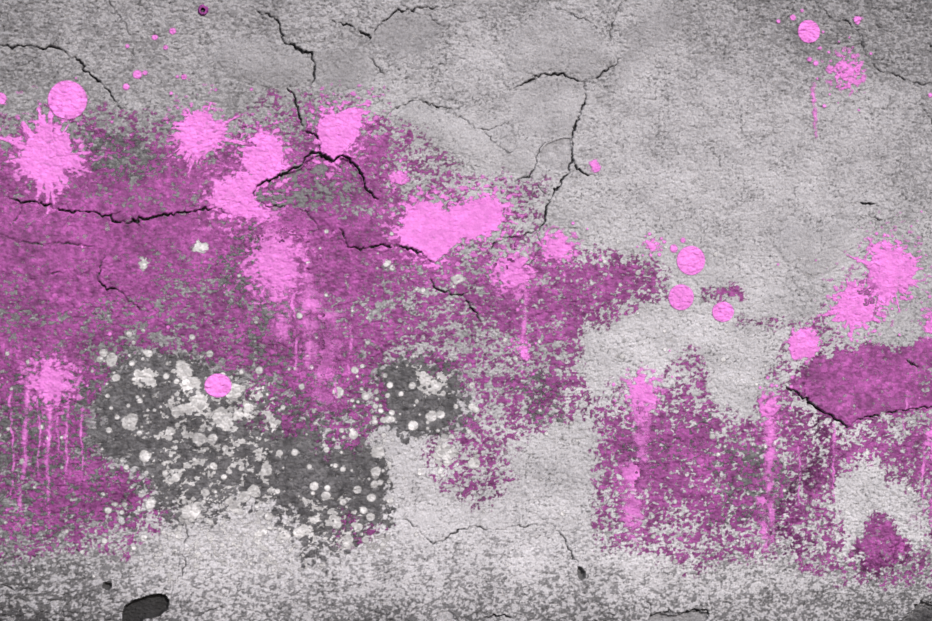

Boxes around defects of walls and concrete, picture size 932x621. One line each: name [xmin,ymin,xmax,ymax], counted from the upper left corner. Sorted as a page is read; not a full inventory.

crack [2,38,115,101]
crack [259,12,316,81]
crack [252,89,377,208]
crack [491,62,618,266]
crack [13,199,211,310]
peeling [0,89,670,562]
peeling [702,282,745,303]
crack [786,387,930,428]
peeling [588,313,932,591]
spalling [100,579,114,592]
spalling [120,592,171,621]
spalling [576,564,588,582]